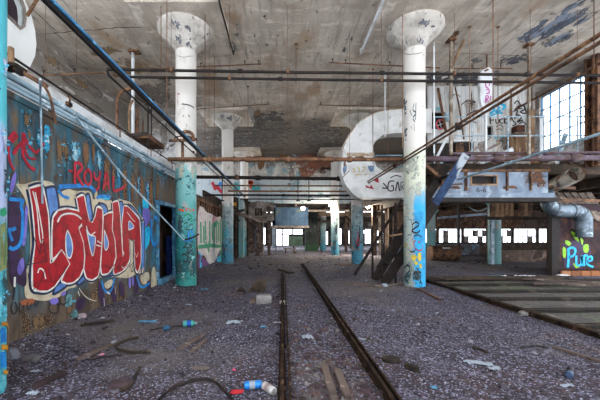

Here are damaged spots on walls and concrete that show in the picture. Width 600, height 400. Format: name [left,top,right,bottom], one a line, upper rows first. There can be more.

spalling [171,19,192,48]
peeling [517,0,599,47]
peeling [288,119,341,182]
rust [528,172,546,188]